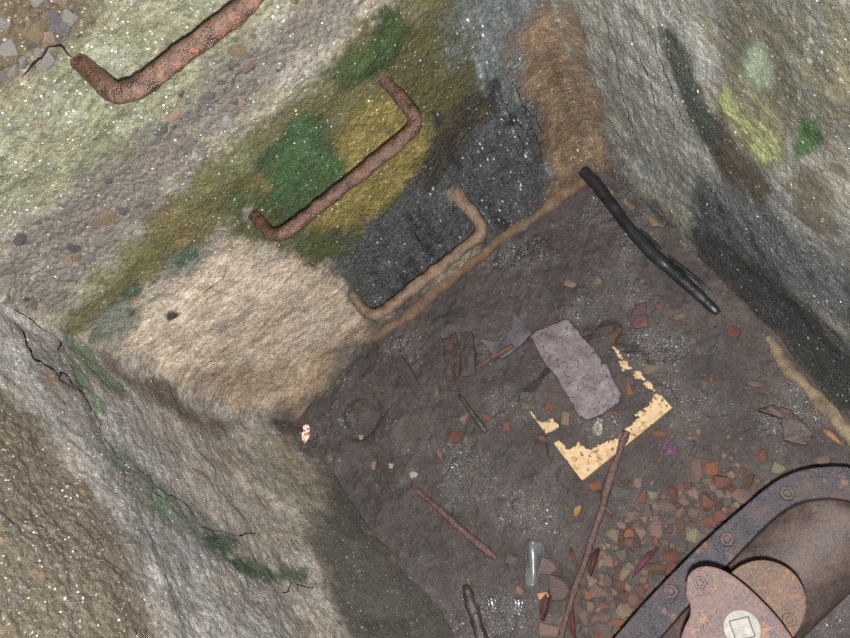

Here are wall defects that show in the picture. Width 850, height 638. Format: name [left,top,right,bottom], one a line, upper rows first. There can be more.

water stain [692,43,850,409]
crack [13,308,260,542]
water stain [99,353,224,436]